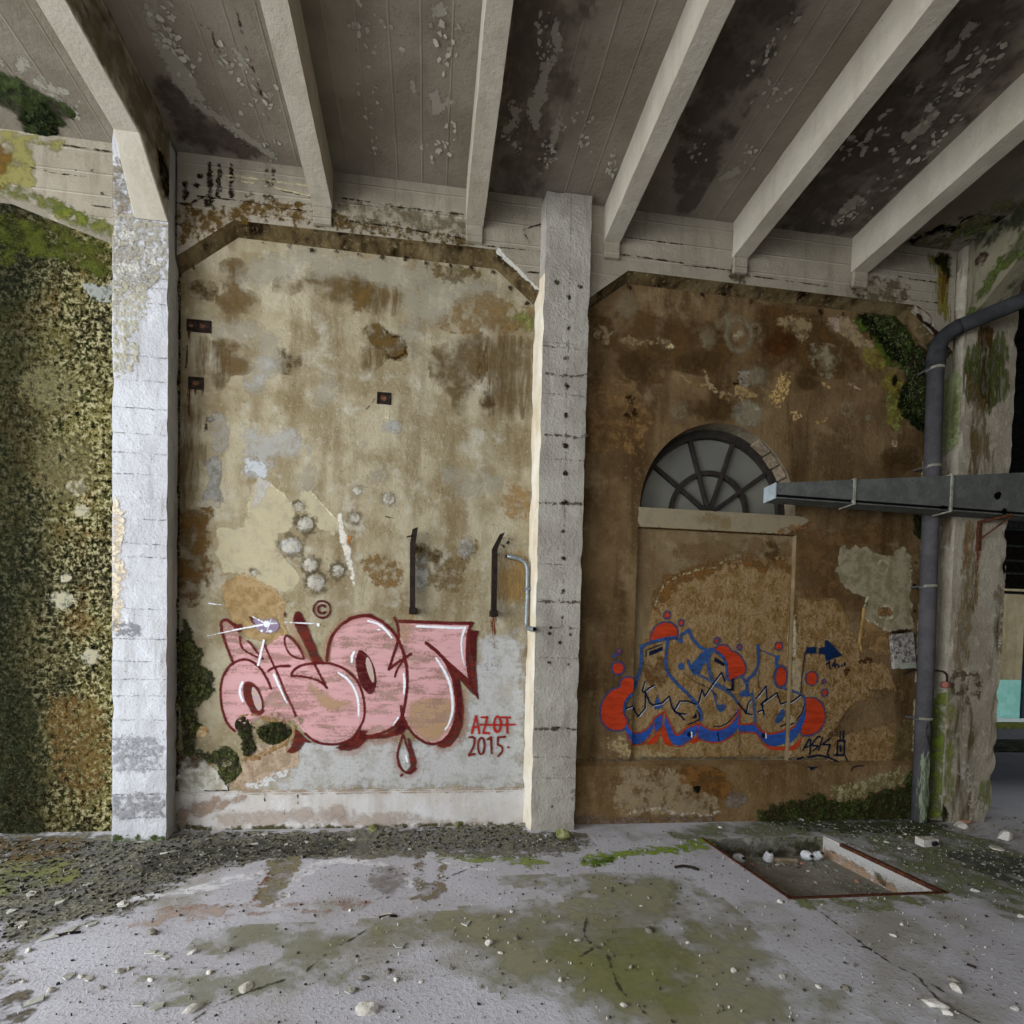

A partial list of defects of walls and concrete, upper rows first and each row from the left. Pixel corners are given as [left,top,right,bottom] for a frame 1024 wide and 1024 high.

peeling [136,0,282,163]
peeling [409,2,461,174]
water stain [498,0,574,195]
water stain [672,27,773,213]
peeling [822,21,1007,227]
peeling [82,212,168,377]
water stain [189,258,253,312]
water stain [364,324,408,364]
water stain [112,620,141,637]
peeling [215,476,339,644]
flaking render [607,523,896,761]
water stain [46,695,165,821]